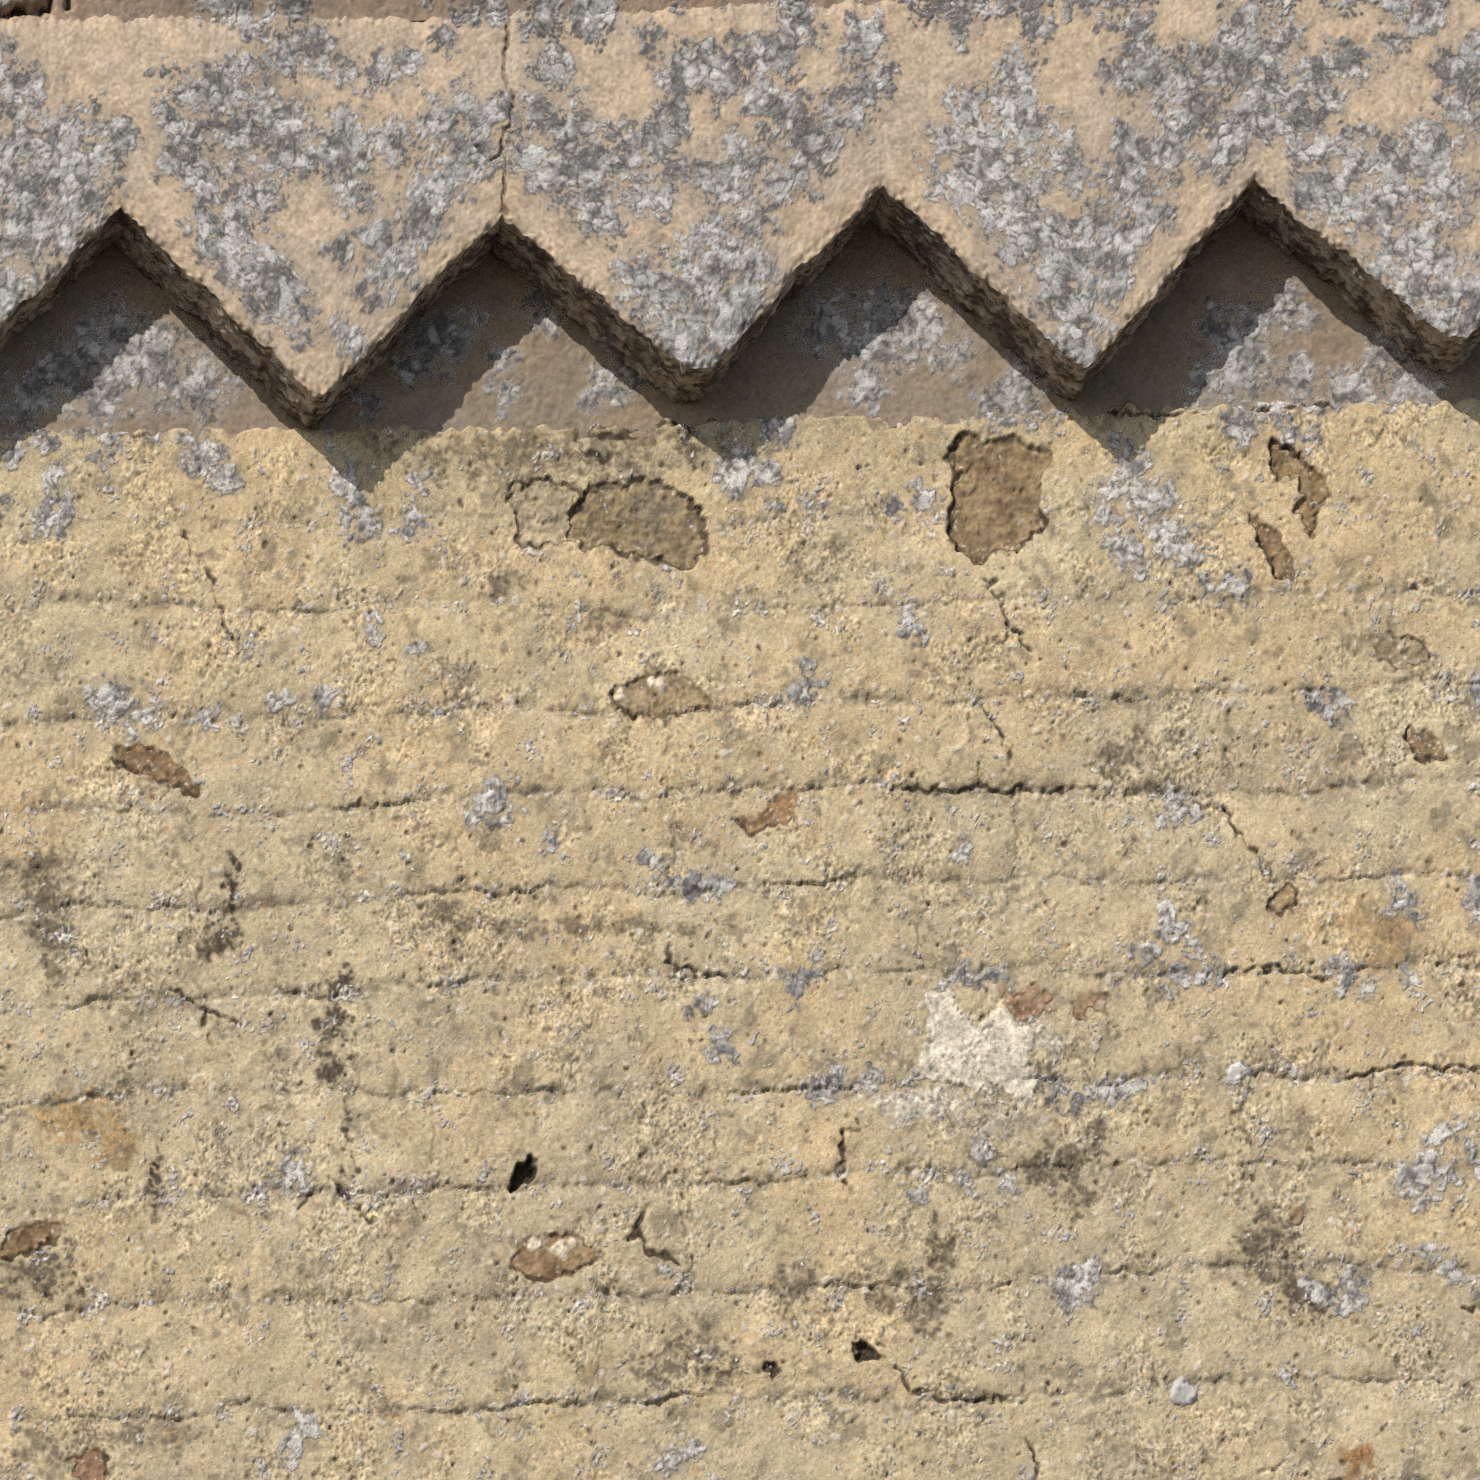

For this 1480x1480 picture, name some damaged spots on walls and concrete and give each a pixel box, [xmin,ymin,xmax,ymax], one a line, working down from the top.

spalling [504,474,709,570]
spalling [943,431,1052,565]
spalling [1250,516,1296,581]
spalling [1269,437,1331,538]
spalling [610,669,712,721]
spalling [111,743,200,797]
spalling [0,1220,64,1262]
spalling [511,1232,604,1283]